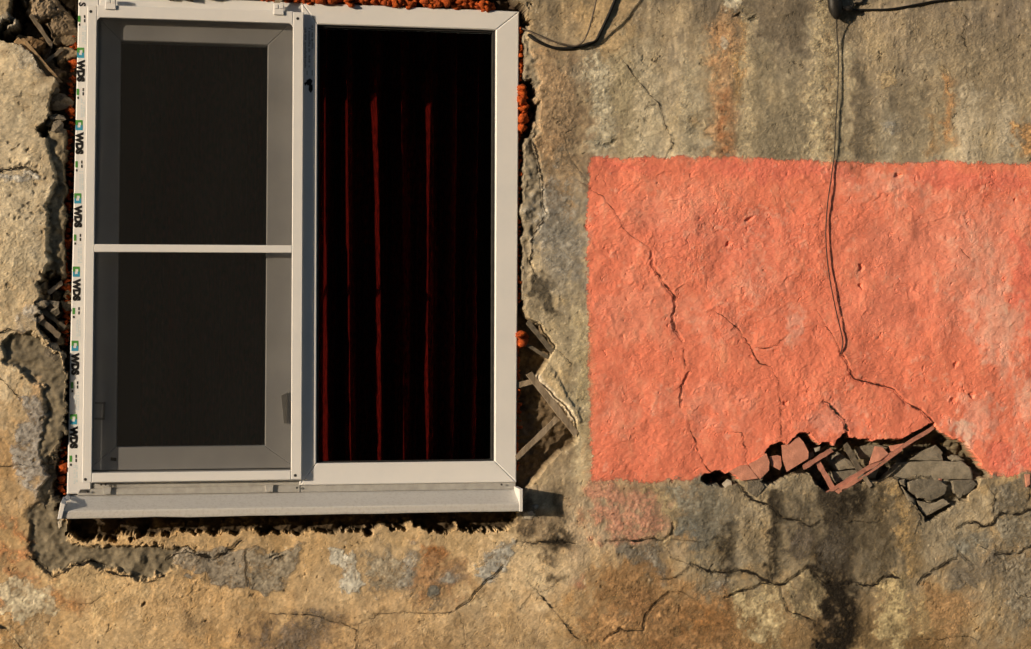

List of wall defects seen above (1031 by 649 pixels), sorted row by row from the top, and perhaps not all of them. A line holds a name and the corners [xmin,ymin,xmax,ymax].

crack [0,166,41,176]
flaking render [582,50,615,150]
spalling [0,0,78,508]
spalling [515,23,587,495]
crack [565,130,710,472]
crack [824,401,848,431]
crack [817,311,932,422]
crack [28,540,242,604]
flaking render [474,538,516,585]
spalling [585,423,1031,649]
crack [608,485,1031,637]
leakage [763,477,881,649]